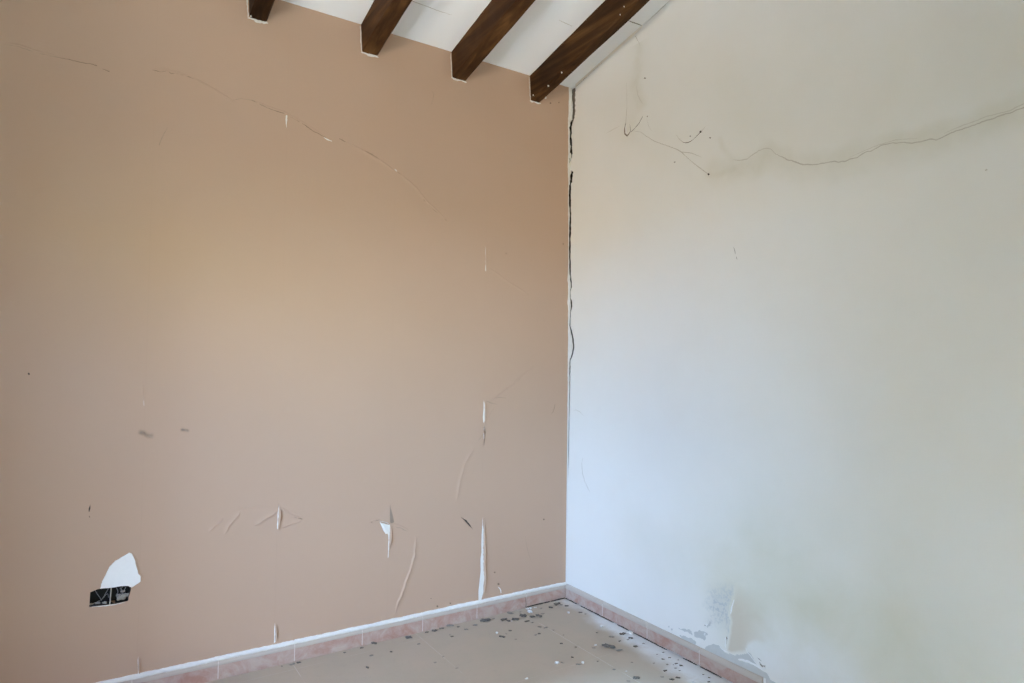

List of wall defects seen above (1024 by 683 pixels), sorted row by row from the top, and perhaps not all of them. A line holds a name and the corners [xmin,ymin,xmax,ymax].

crack [609,83,710,175]
crack [737,103,1024,165]
crack [562,63,602,600]
flaking render [101,553,141,589]
peeling [668,575,899,683]